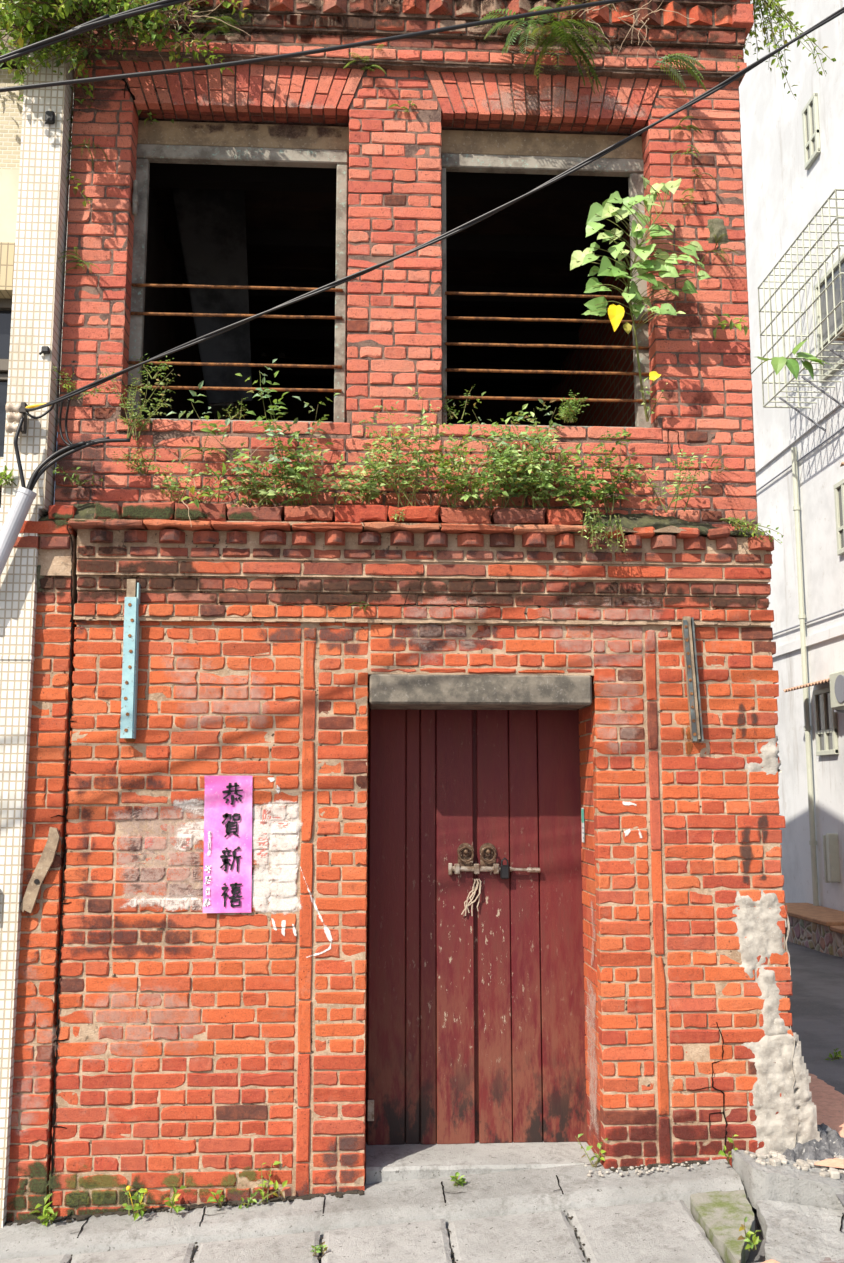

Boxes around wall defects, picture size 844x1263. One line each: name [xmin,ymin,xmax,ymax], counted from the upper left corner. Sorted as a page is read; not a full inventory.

damp [173,0,284,47]
damp [297,0,416,43]
damp [456,0,736,59]
damp [557,582,770,611]
peeling [173,799,204,851]
damp [758,815,768,842]
crack [49,524,89,1238]
peeling [122,894,203,912]
peeling [753,905,795,1086]
crack [678,1022,727,1153]
damp [227,1138,358,1201]